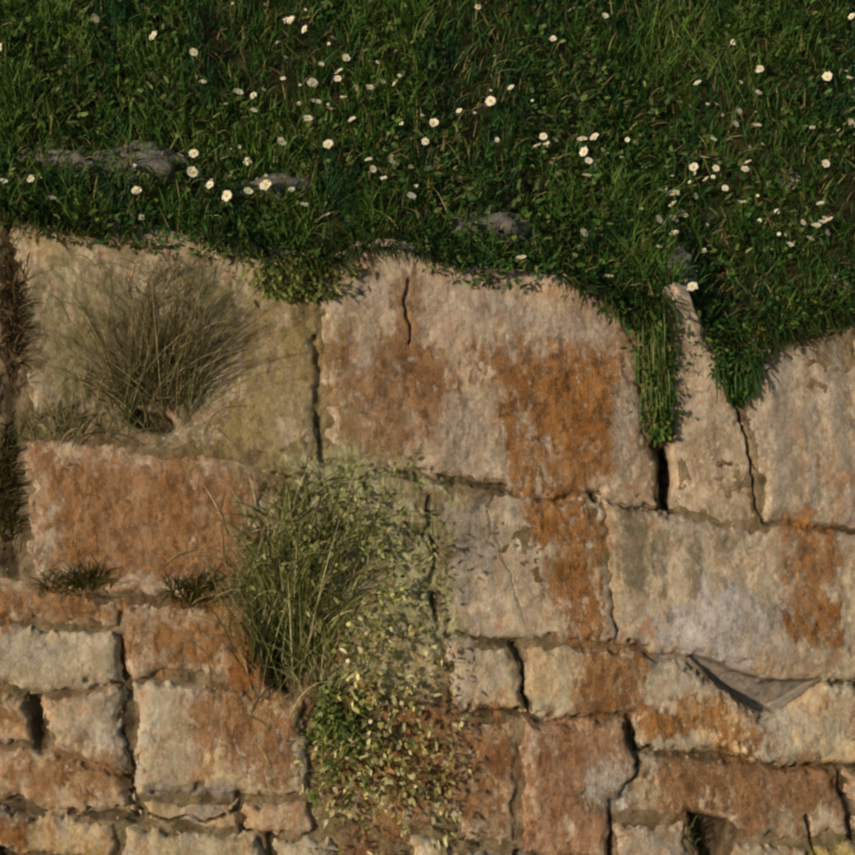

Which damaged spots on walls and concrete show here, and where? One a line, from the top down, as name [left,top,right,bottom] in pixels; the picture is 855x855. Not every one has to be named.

crack [486,510,524,619]
crack [149,812,227,824]